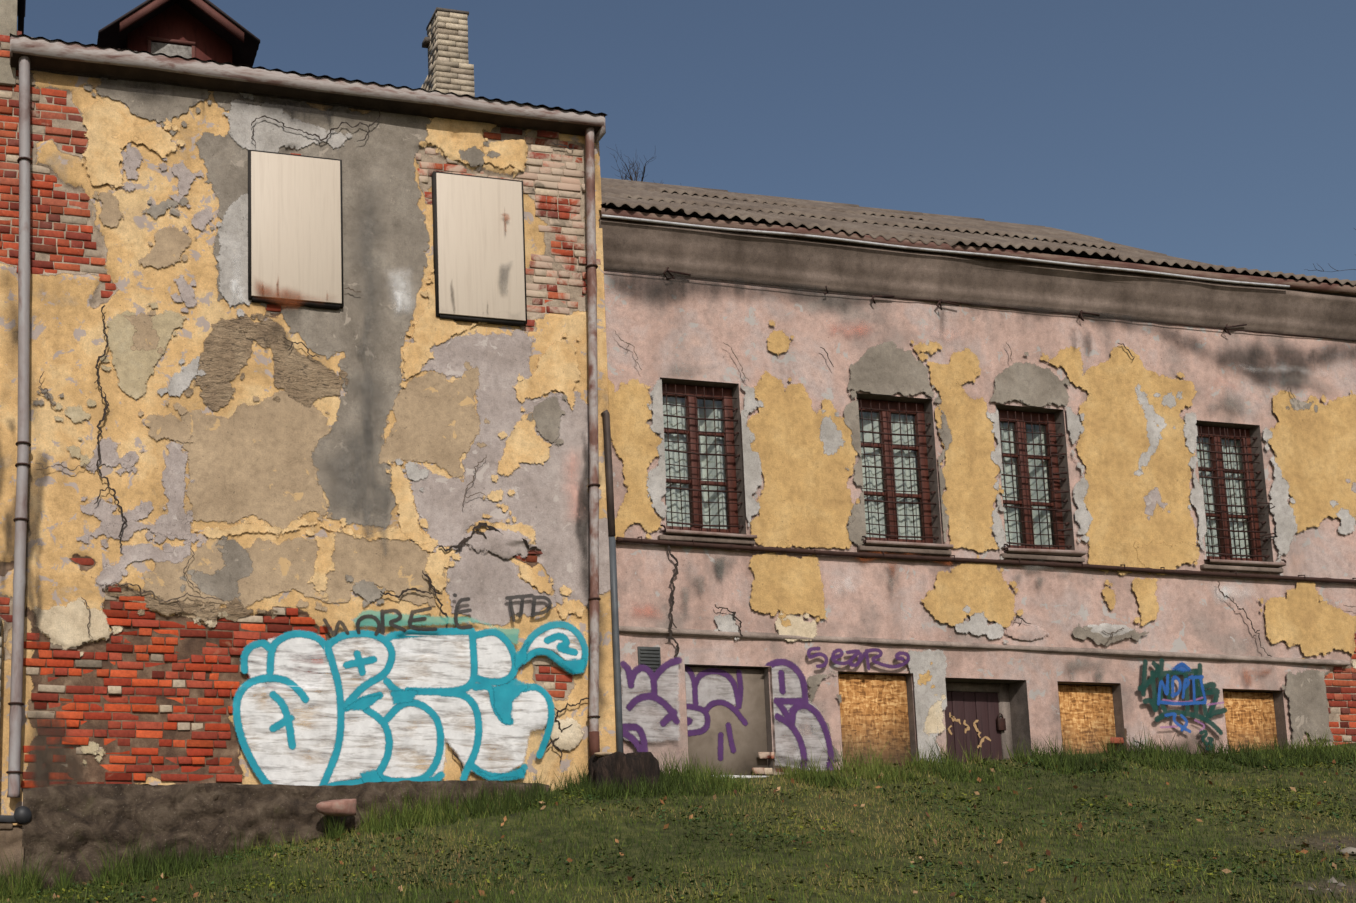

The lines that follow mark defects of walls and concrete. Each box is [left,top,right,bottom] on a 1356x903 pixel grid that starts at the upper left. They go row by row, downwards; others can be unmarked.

corrosion [258,282,301,301]
crack [37,305,127,548]
peeling [0,70,663,794]
peeling [743,371,860,642]
peeling [911,340,1024,644]
peeling [1024,345,1202,646]
peeling [1268,390,1356,535]
crack [81,546,224,637]
crack [666,534,680,658]
peeling [714,613,740,640]
crack [715,604,743,636]
peeling [1258,581,1356,745]